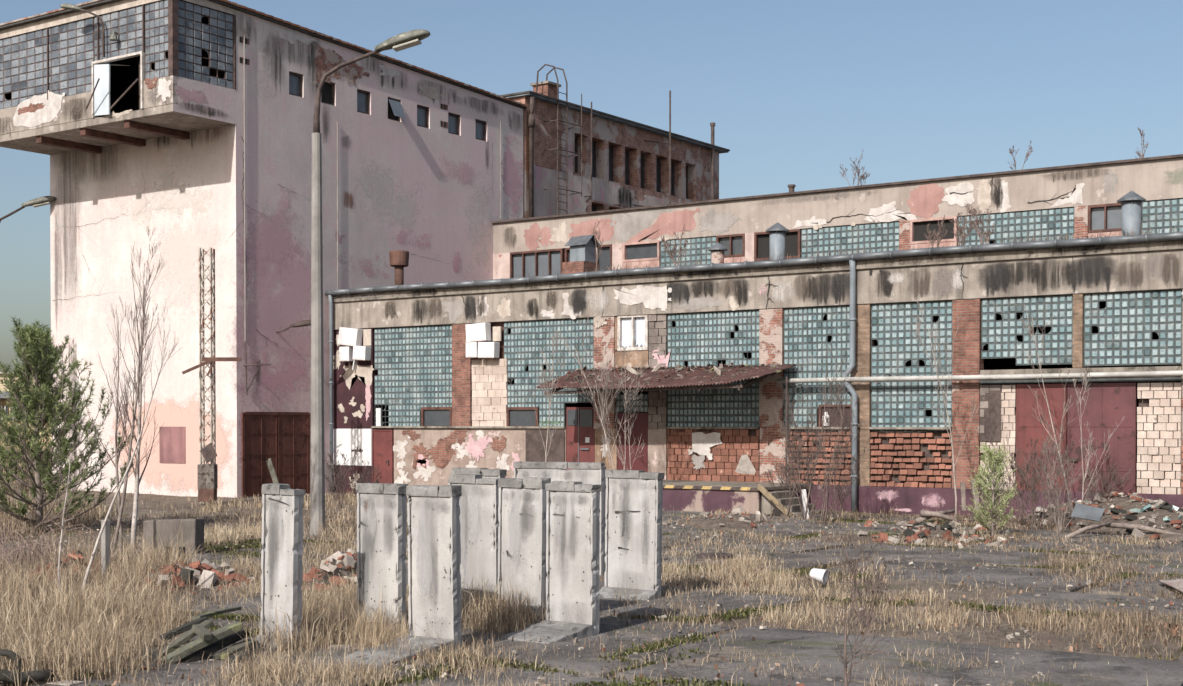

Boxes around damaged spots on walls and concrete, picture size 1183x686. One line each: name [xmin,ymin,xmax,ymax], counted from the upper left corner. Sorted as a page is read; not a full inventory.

peeling [13,90,65,127]
damp [55,165,75,313]
peeling [792,216,834,230]
peeling [851,179,1012,226]
peeling [1051,183,1085,207]
damp [878,256,962,297]
damp [980,240,1183,295]
damp [412,290,441,322]
damp [465,296,484,320]
peeling [333,335,374,423]
peeling [393,428,520,484]
peeling [688,432,723,470]